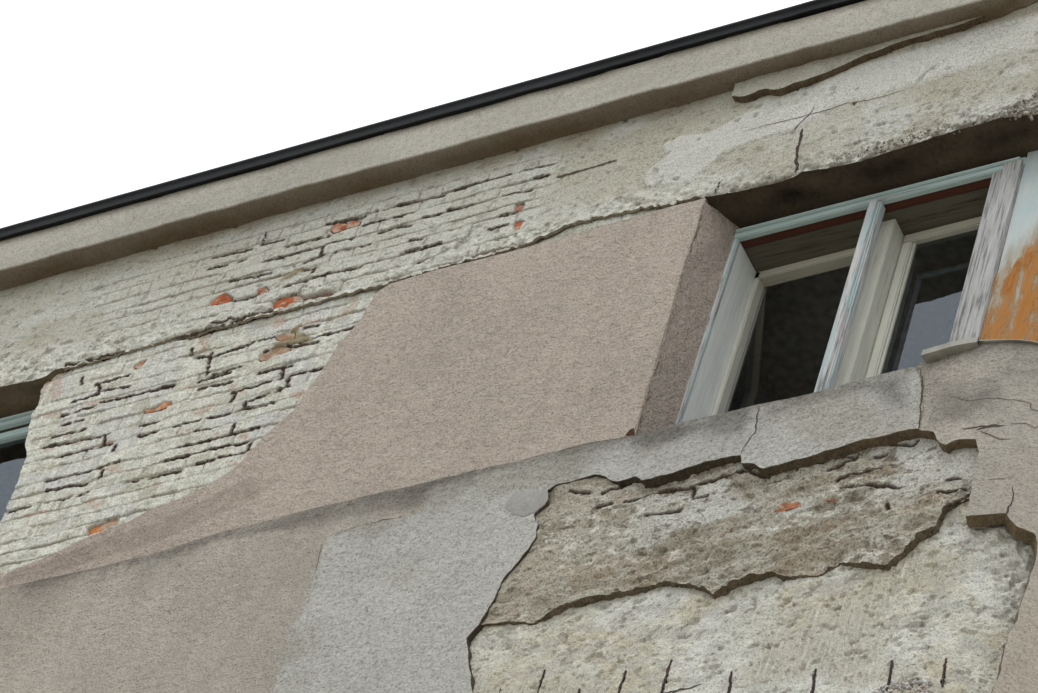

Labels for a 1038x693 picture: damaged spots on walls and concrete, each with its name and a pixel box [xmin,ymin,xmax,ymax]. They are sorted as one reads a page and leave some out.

flaking render [0,287,384,578]
flaking render [0,2,1038,387]
crack [749,90,904,173]
crack [918,370,1038,440]
corrosion [981,242,1038,342]
spalling [470,438,1034,693]